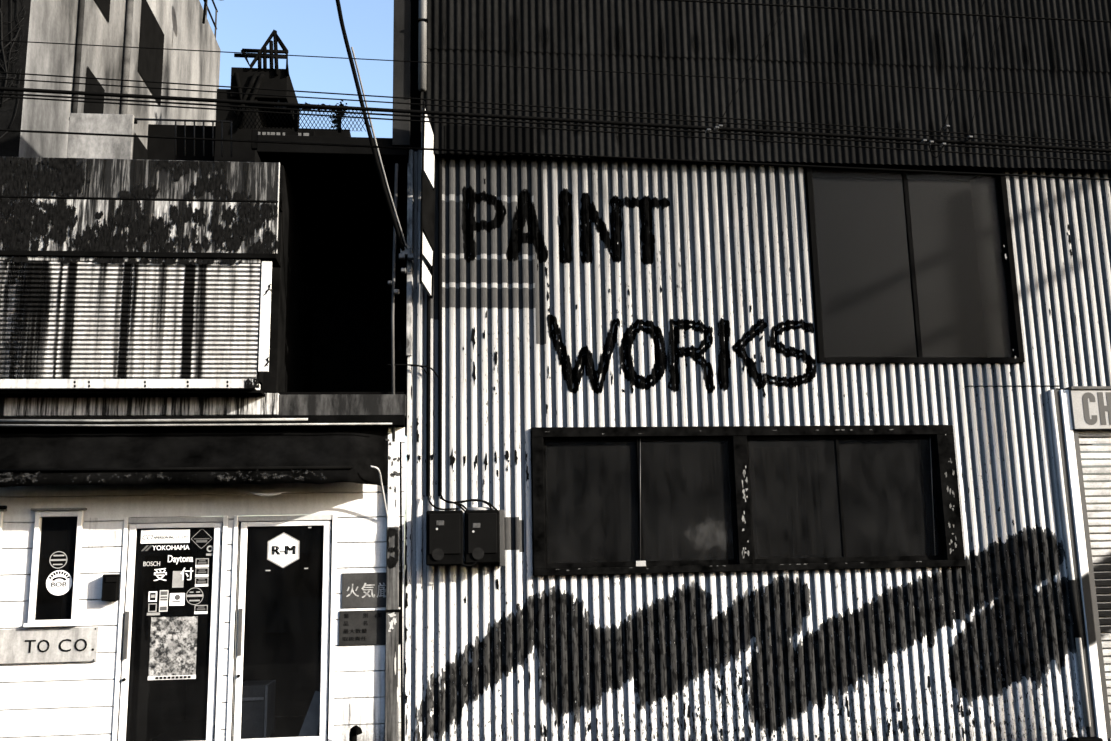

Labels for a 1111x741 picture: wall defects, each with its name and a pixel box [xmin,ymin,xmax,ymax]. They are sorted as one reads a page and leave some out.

damp [49,158,116,249]
damp [0,192,78,379]
damp [90,160,263,379]
peeling [450,448,529,485]
peeling [386,439,434,641]
peeling [394,652,408,736]
peeling [534,676,754,741]
peeling [742,665,1074,741]